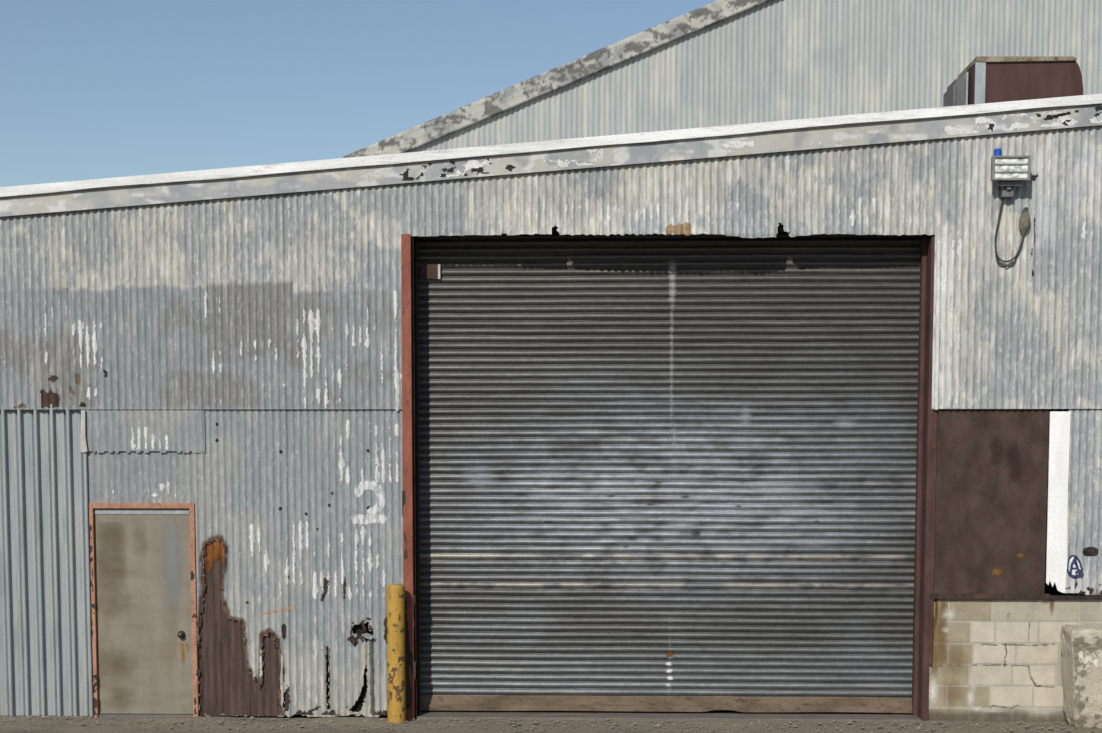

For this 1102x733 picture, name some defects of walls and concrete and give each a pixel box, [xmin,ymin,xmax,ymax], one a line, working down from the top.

peeling [945,109,1102,135]
peeling [438,158,499,178]
peeling [543,149,604,168]
peeling [723,141,754,152]
peeling [1077,194,1094,240]
peeling [938,235,975,404]
corrosion [40,373,86,408]
corrosion [191,536,357,716]